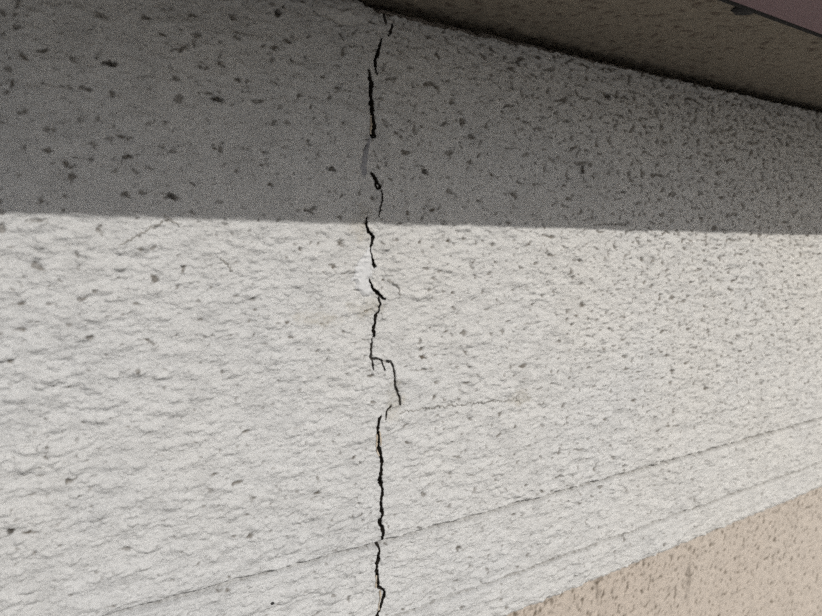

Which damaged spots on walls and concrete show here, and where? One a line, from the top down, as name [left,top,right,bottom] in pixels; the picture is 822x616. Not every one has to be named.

crack [367,13,393,137]
crack [365,172,520,616]